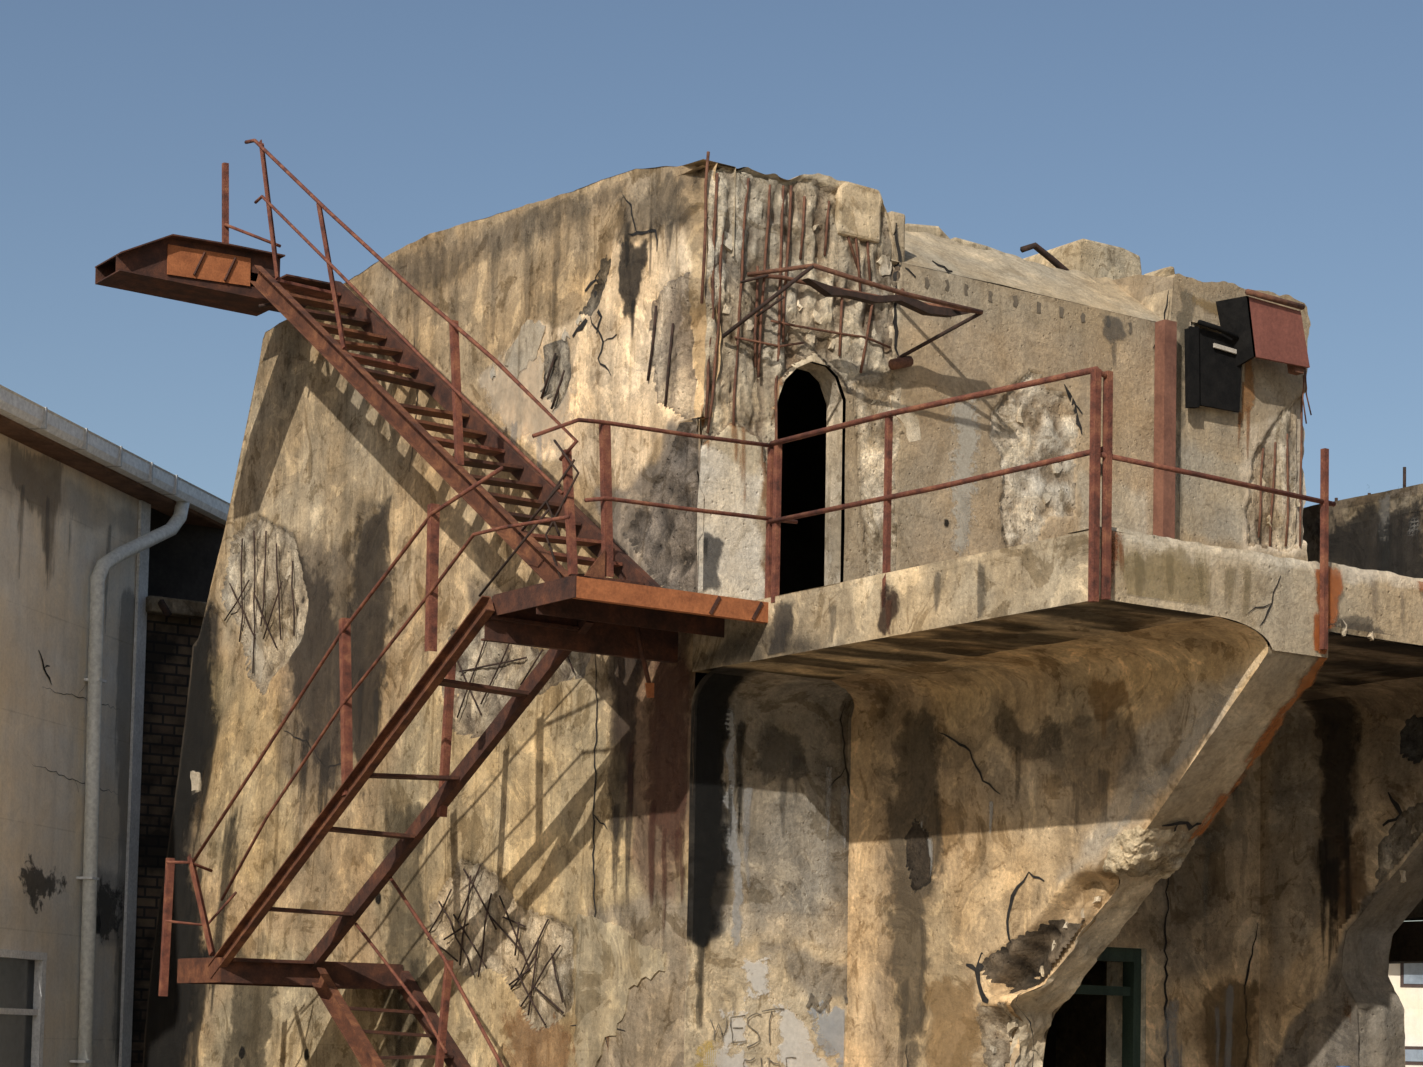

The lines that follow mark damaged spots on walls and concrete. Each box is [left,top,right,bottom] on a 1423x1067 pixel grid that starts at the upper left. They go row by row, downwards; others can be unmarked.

leakage [618,236,648,335]
spalling [623,151,921,592]
spalling [221,516,308,695]
spalling [427,858,667,1067]
leakage [692,673,807,1025]
leakage [885,709,944,1067]
spalling [976,896,1101,1067]
crack [1162,878,1170,1067]
crack [1162,821,1202,832]
rust [1190,566,1343,841]
leakage [1303,696,1362,959]
spalling [1400,715,1423,764]